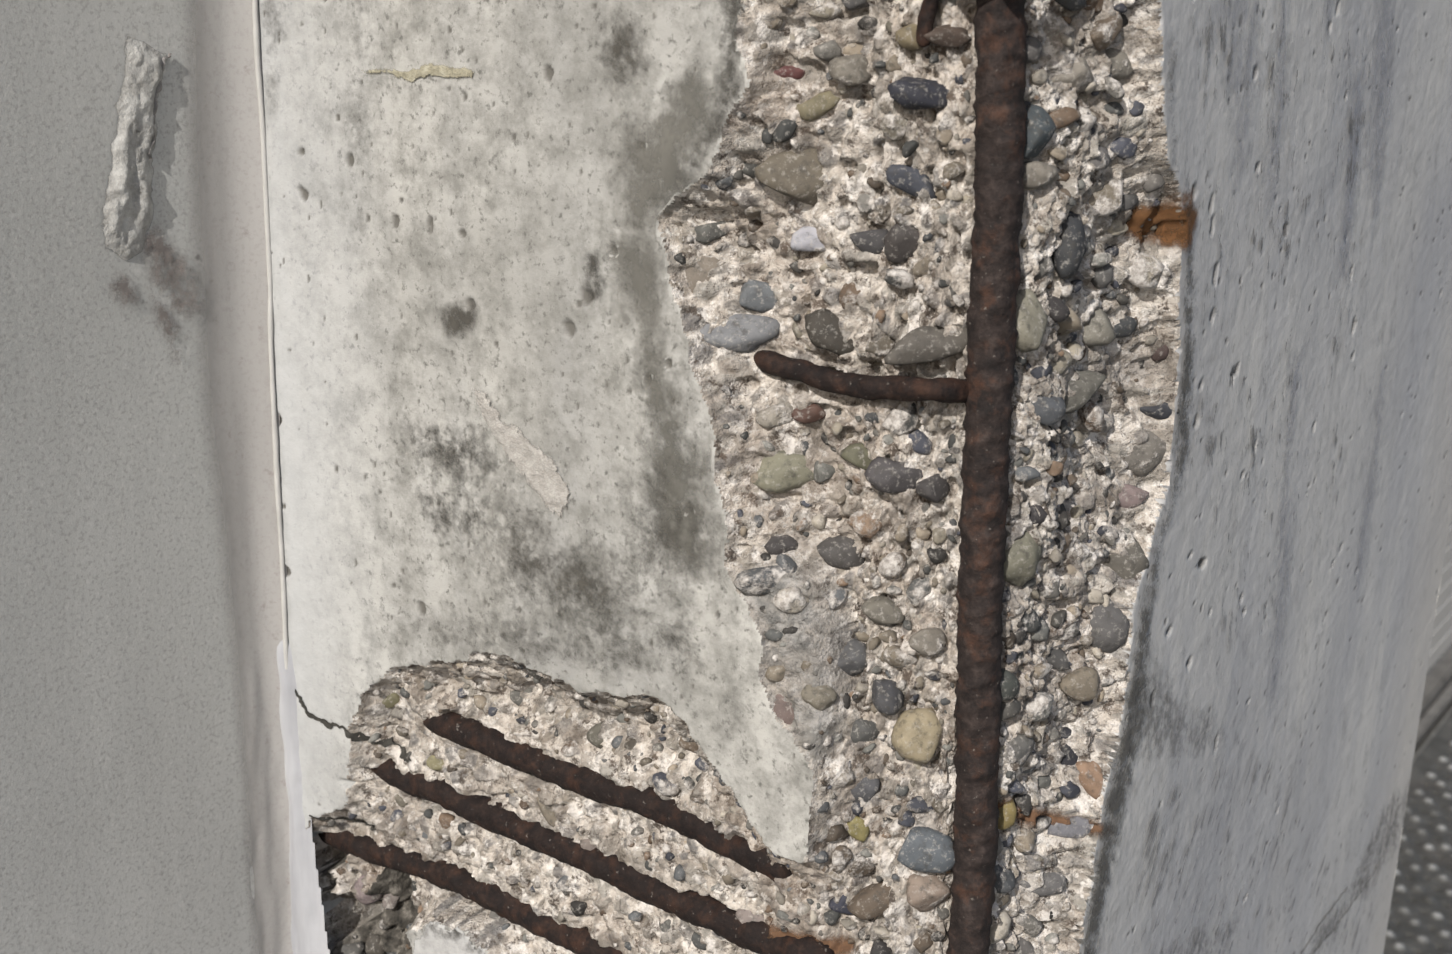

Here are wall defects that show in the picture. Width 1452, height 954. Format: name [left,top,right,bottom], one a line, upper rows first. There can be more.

rust [1125,193,1198,247]
leakage [588,0,745,569]
leakage [442,306,475,335]
leakage [426,429,490,471]
spalling [306,0,977,954]
spalling [989,0,1183,954]
leakage [427,497,478,527]
leakage [509,532,614,631]
crack [295,689,411,763]
rust [998,801,1111,834]
rust [769,918,854,954]